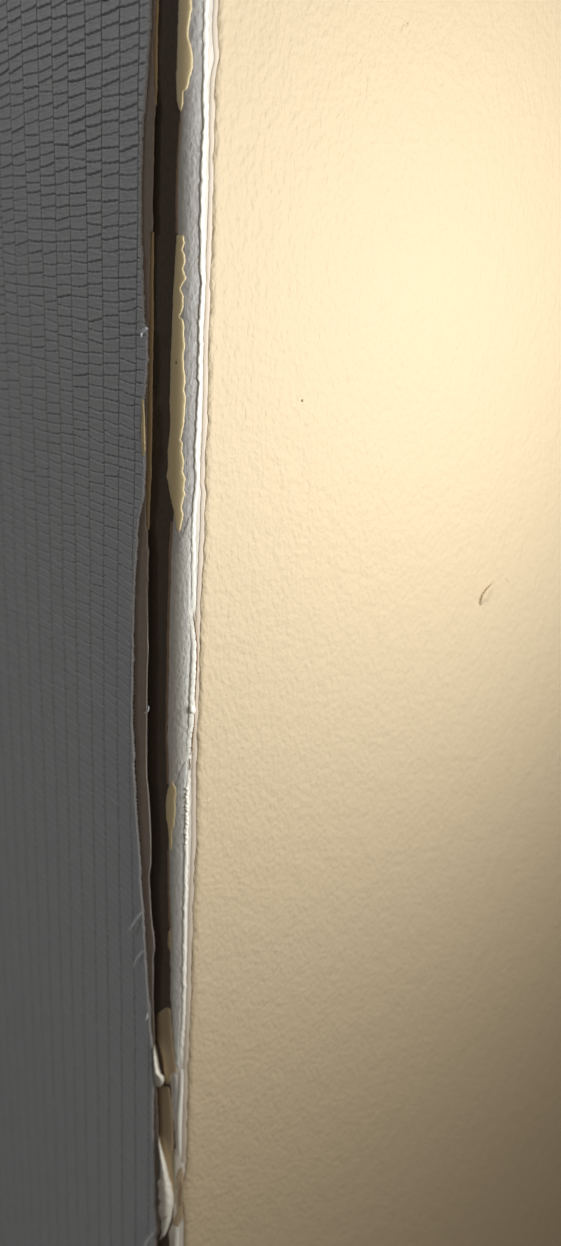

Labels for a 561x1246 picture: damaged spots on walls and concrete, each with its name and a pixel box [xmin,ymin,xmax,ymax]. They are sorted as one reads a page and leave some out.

flaking render [141,0,203,1202]
crack [189,616,198,768]